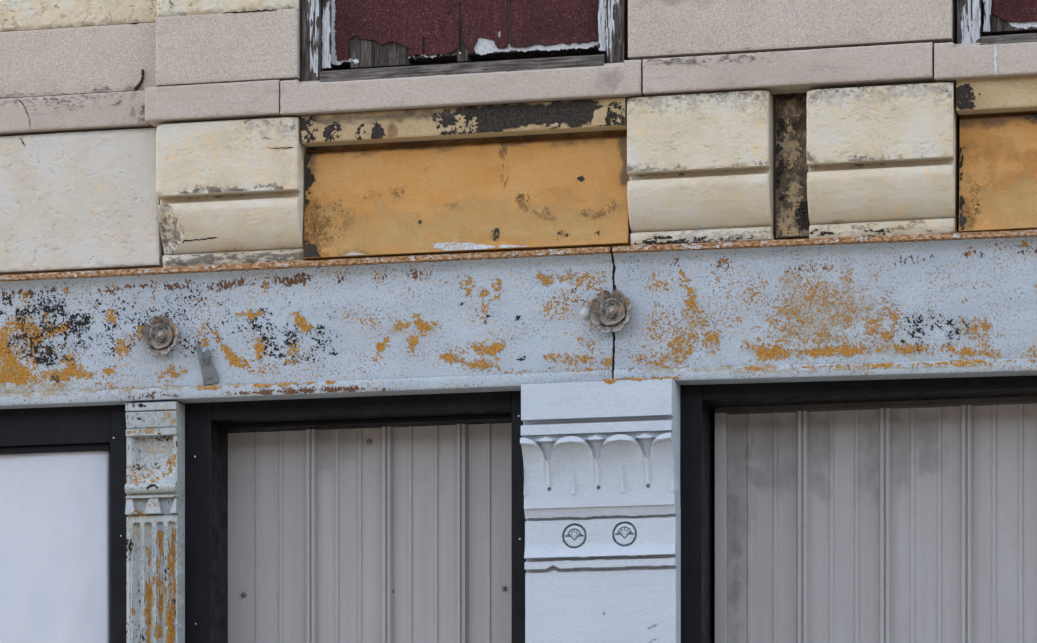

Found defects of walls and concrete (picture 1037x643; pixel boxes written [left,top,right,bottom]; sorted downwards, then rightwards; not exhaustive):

peeling [307,0,359,77]
peeling [474,0,620,55]
peeling [961,0,992,44]
peeling [1008,20,1037,29]
water stain [776,93,806,101]
peeling [297,100,625,266]
water stain [634,113,834,245]
crack [609,246,617,290]
peeling [0,281,346,383]
crack [609,332,617,379]
peeling [898,309,974,354]